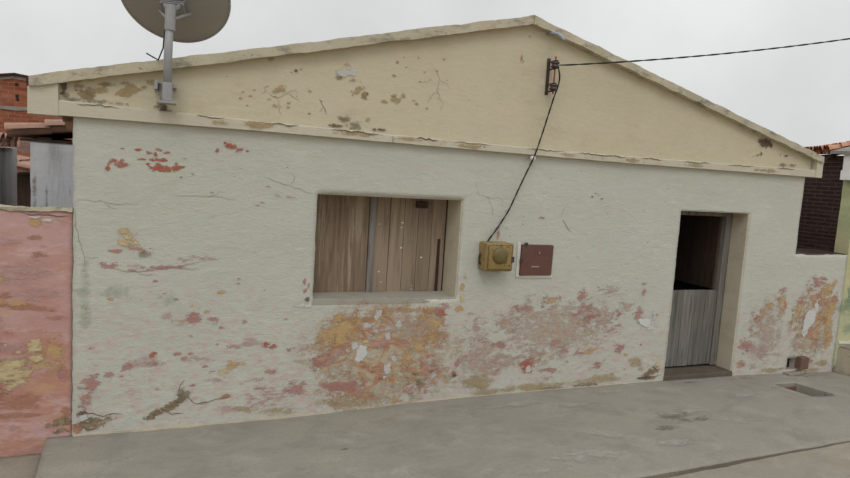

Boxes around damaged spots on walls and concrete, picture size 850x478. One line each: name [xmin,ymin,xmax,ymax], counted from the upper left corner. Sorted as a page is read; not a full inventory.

flaking render [336,63,368,100]
peeling [105,148,186,178]
peeling [100,228,216,271]
peeling [0,311,60,391]
peeling [161,305,223,329]
peeling [174,352,245,383]
peeling [215,338,277,349]
peeling [296,275,661,411]
peeling [737,275,839,369]
flaking render [44,352,163,434]
flaking render [143,369,306,420]